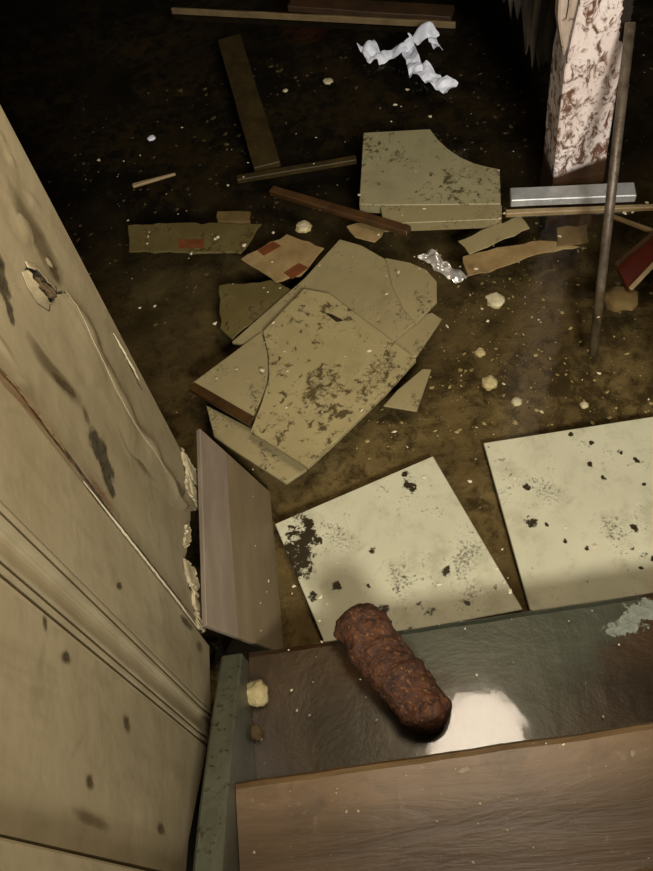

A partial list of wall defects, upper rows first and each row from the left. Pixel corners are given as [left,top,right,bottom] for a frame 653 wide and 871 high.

damp [0,256,15,325]
crack [113,333,142,390]
damp [84,410,115,497]
peeling [600,597,653,637]